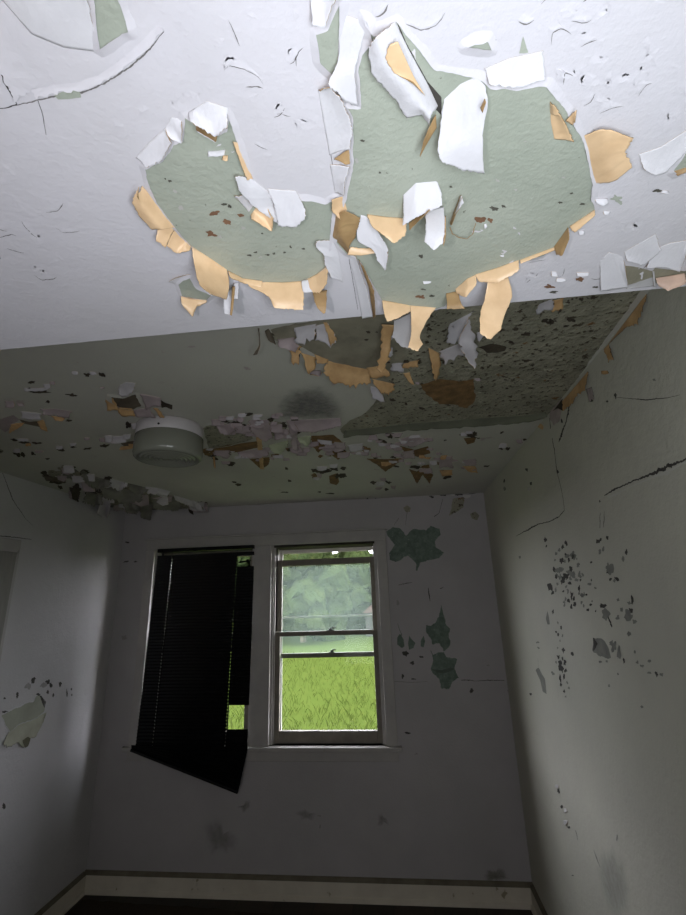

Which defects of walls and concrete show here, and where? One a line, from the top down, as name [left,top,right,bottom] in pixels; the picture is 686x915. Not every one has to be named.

peeling [0,0,164,106]
peeling [132,0,686,499]
peeling [0,371,208,521]
crack [519,407,572,535]
crack [604,458,686,498]
peeling [386,525,444,571]
peeling [397,603,459,690]
flaking render [529,514,637,697]
flaking render [592,638,663,677]
peeling [1,677,72,748]